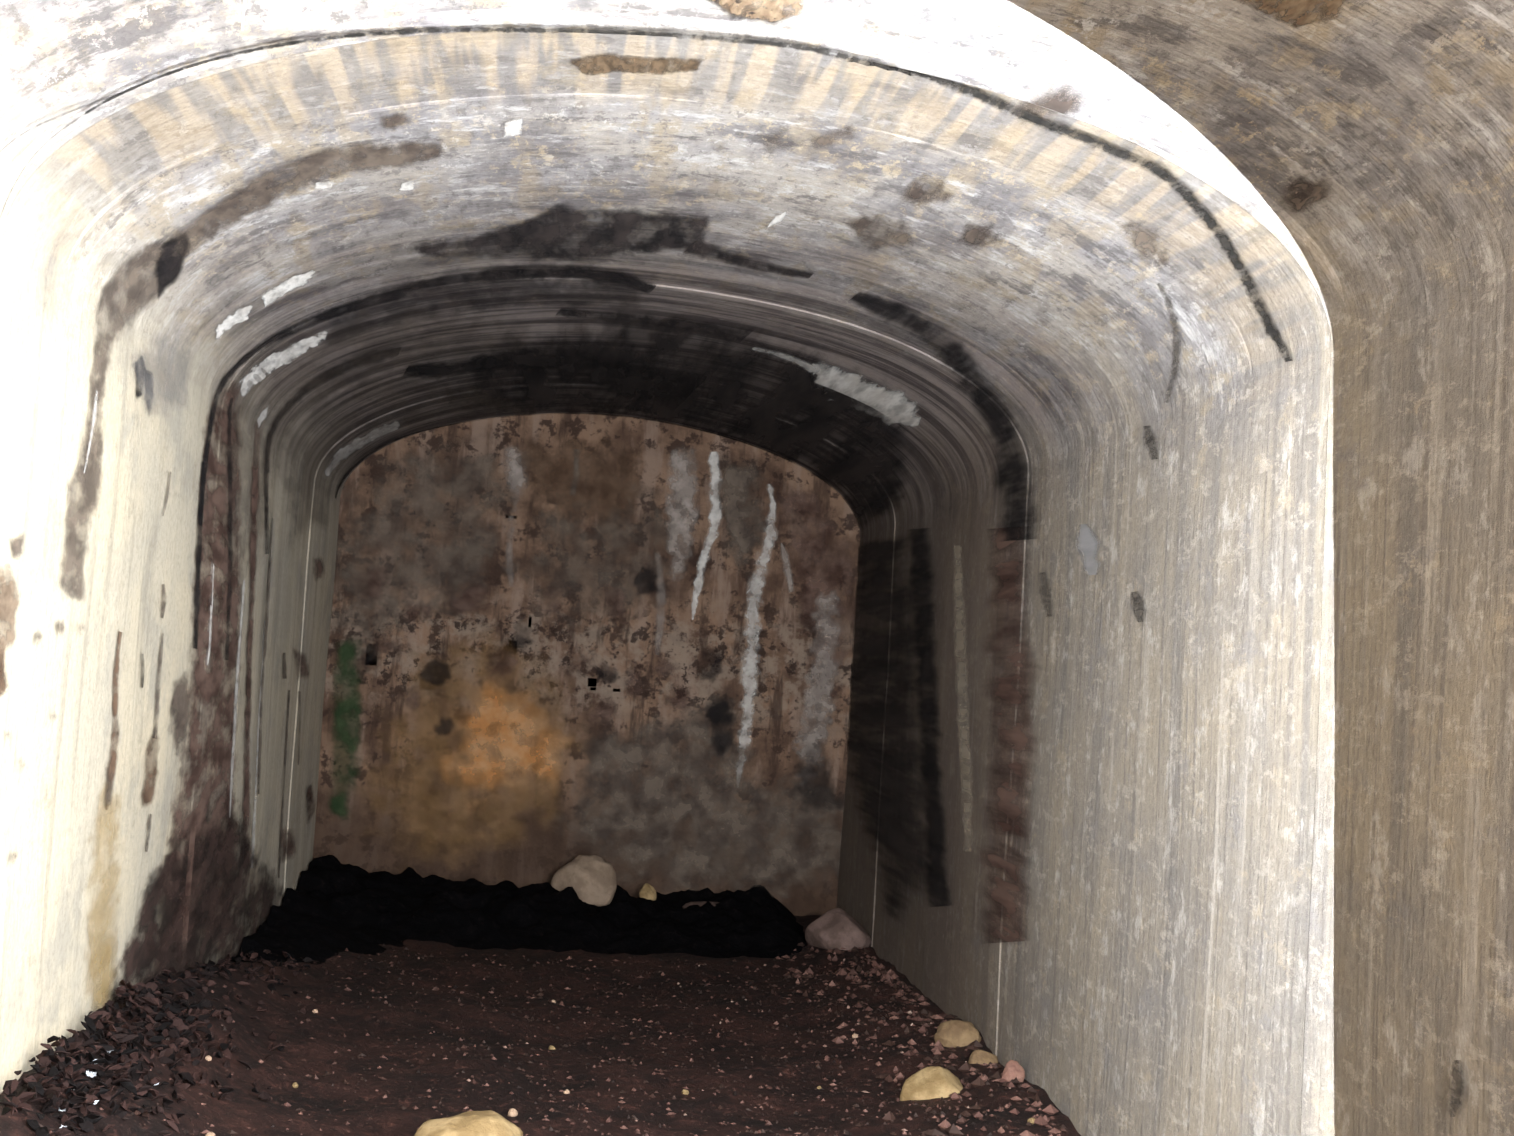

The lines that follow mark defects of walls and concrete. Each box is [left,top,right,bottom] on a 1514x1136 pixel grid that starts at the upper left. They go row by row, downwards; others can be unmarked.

spalling [710,0,803,23]
spalling [1245,0,1345,27]
spalling [572,55,700,75]
leakage [505,121,522,136]
leakage [415,206,708,260]
leakage [62,115,442,598]
leakage [666,452,721,615]
leakage [112,331,327,1003]
leakage [411,661,449,707]
leakage [580,483,949,913]
leakage [436,720,452,734]
leakage [984,528,1031,943]